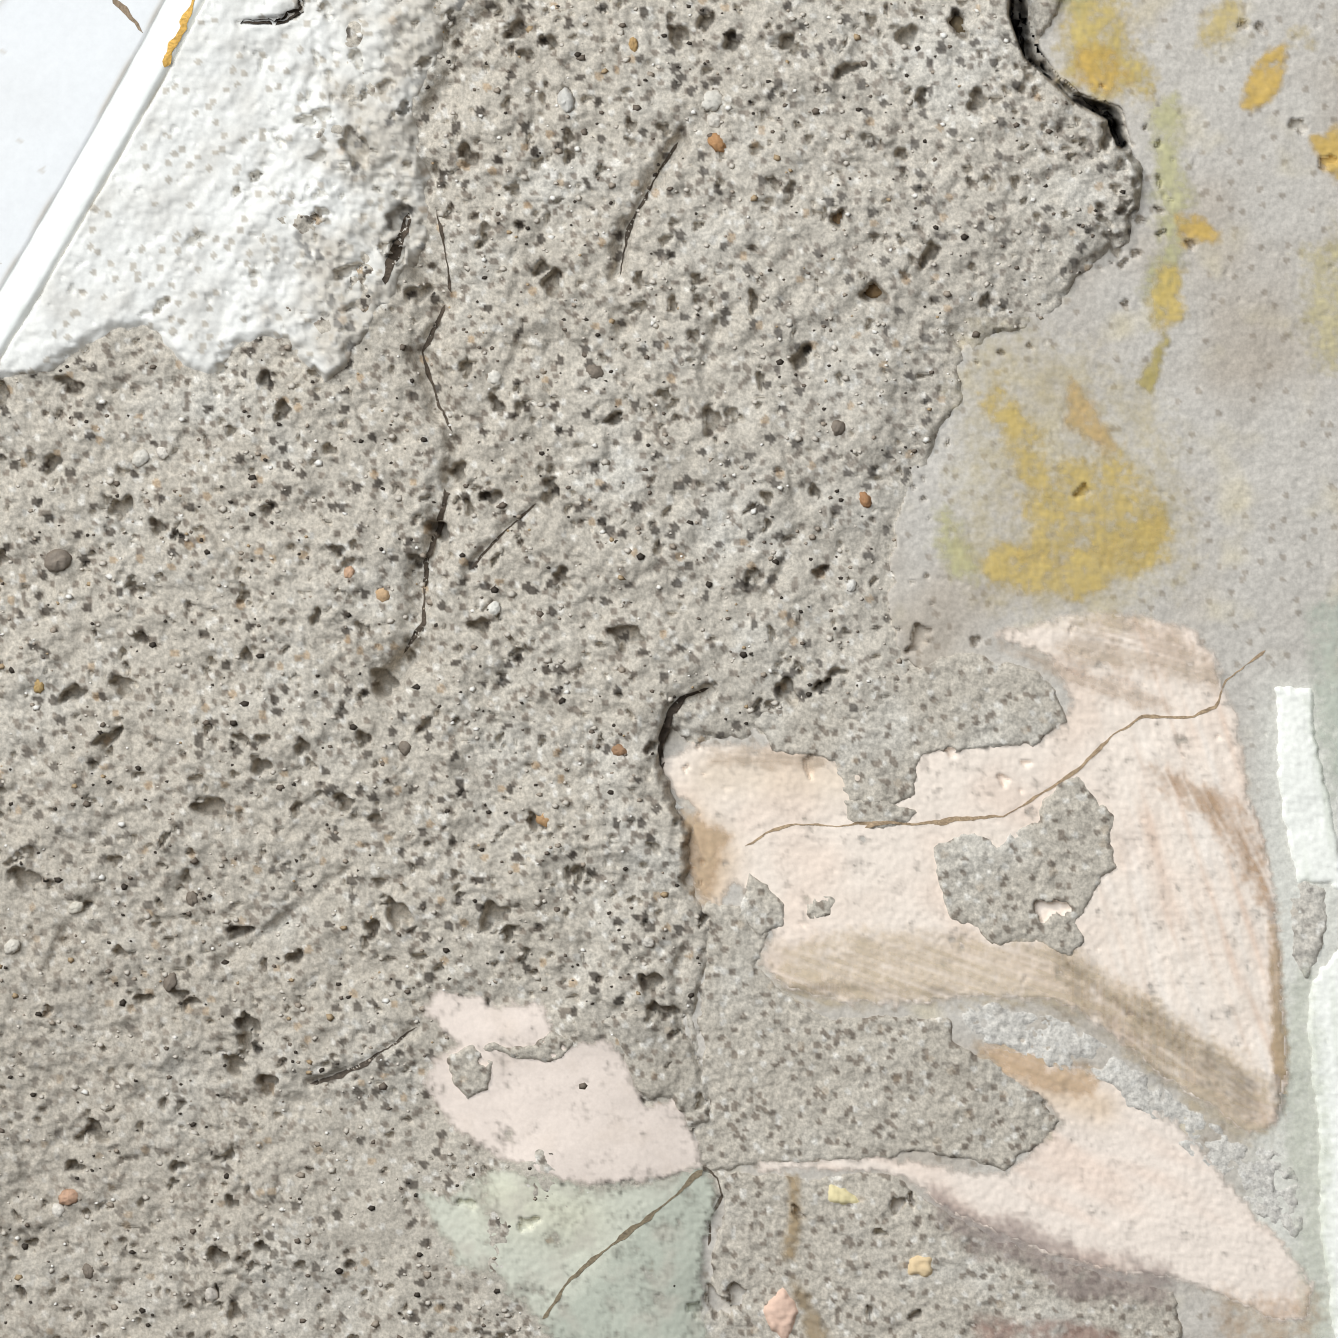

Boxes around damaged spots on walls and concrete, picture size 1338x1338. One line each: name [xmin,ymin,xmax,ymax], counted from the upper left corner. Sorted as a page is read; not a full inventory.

crack [241,0,303,25]
spalling [1028,0,1063,44]
crack [1010,0,1126,146]
peeling [0,0,466,382]
crack [745,650,1265,846]
peeling [663,612,1288,1132]
peeling [423,990,710,1194]
spalling [693,901,1314,1338]
peeling [421,1169,697,1318]
peeling [539,1172,721,1338]
crack [542,1166,723,1319]